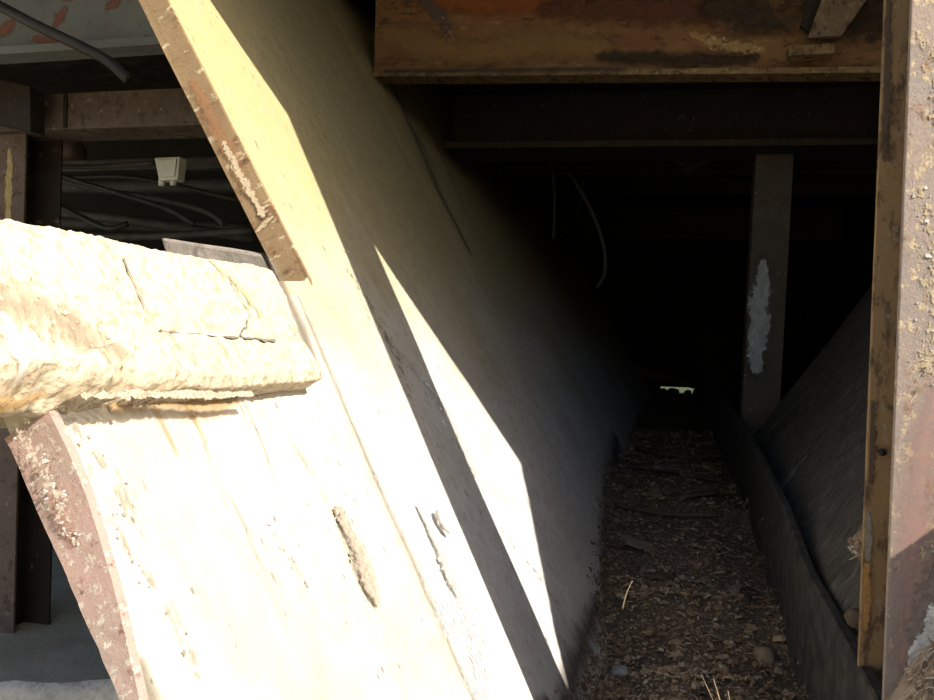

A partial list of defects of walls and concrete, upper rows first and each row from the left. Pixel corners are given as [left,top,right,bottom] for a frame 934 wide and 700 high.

crack [123,257,277,342]
peeling [747,259,772,375]
peeling [6,417,82,553]
peeling [114,468,157,589]
spalling [57,388,254,447]
spalling [292,442,381,606]
corrosion [868,401,879,484]
peeling [164,602,201,678]